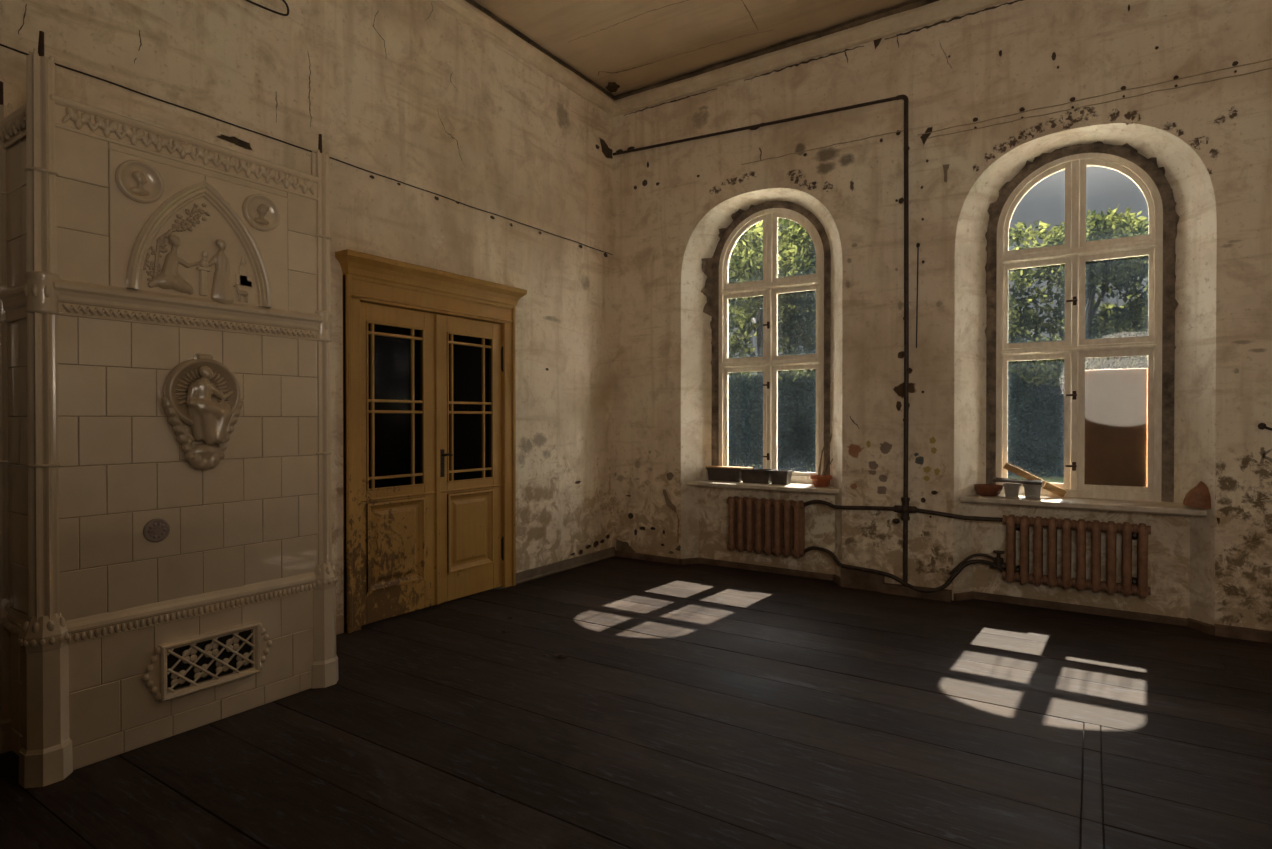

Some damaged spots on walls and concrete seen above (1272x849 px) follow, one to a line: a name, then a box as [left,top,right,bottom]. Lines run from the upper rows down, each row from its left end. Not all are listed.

flaking render [516,480,581,546]
flaking render [570,512,681,556]
flaking render [842,490,954,586]
flaking render [1215,445,1272,628]